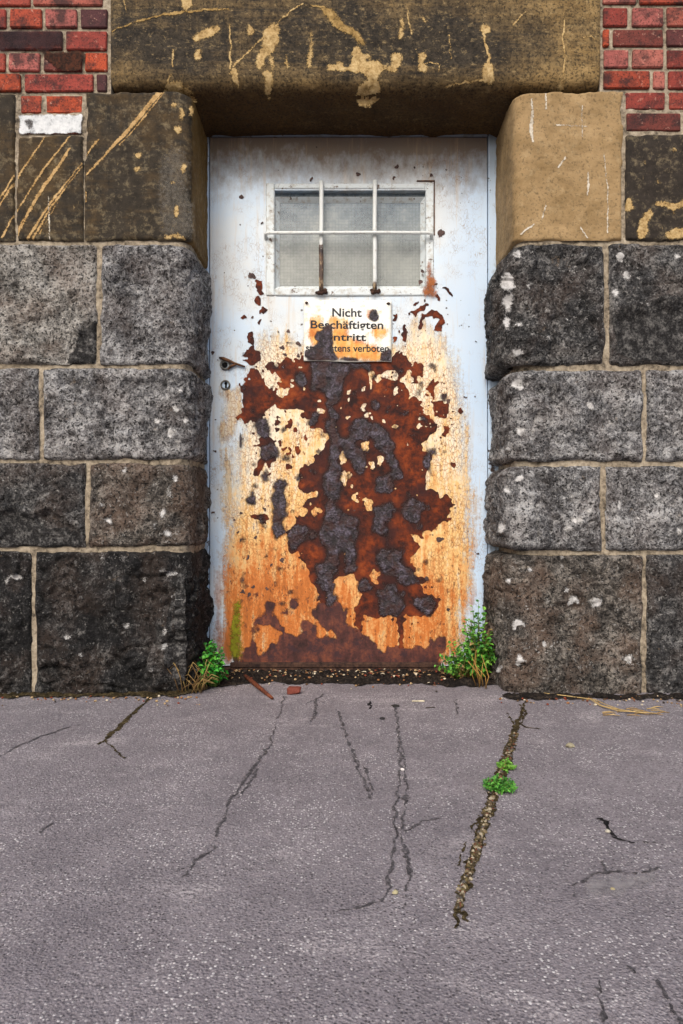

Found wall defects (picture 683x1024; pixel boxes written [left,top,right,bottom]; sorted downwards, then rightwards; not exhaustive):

rust [423,263,437,297]
rust [216,310,475,700]
peeling [233,269,476,649]
crack [1,698,150,758]
crack [177,693,446,910]
crack [453,701,539,928]
crack [572,818,661,896]